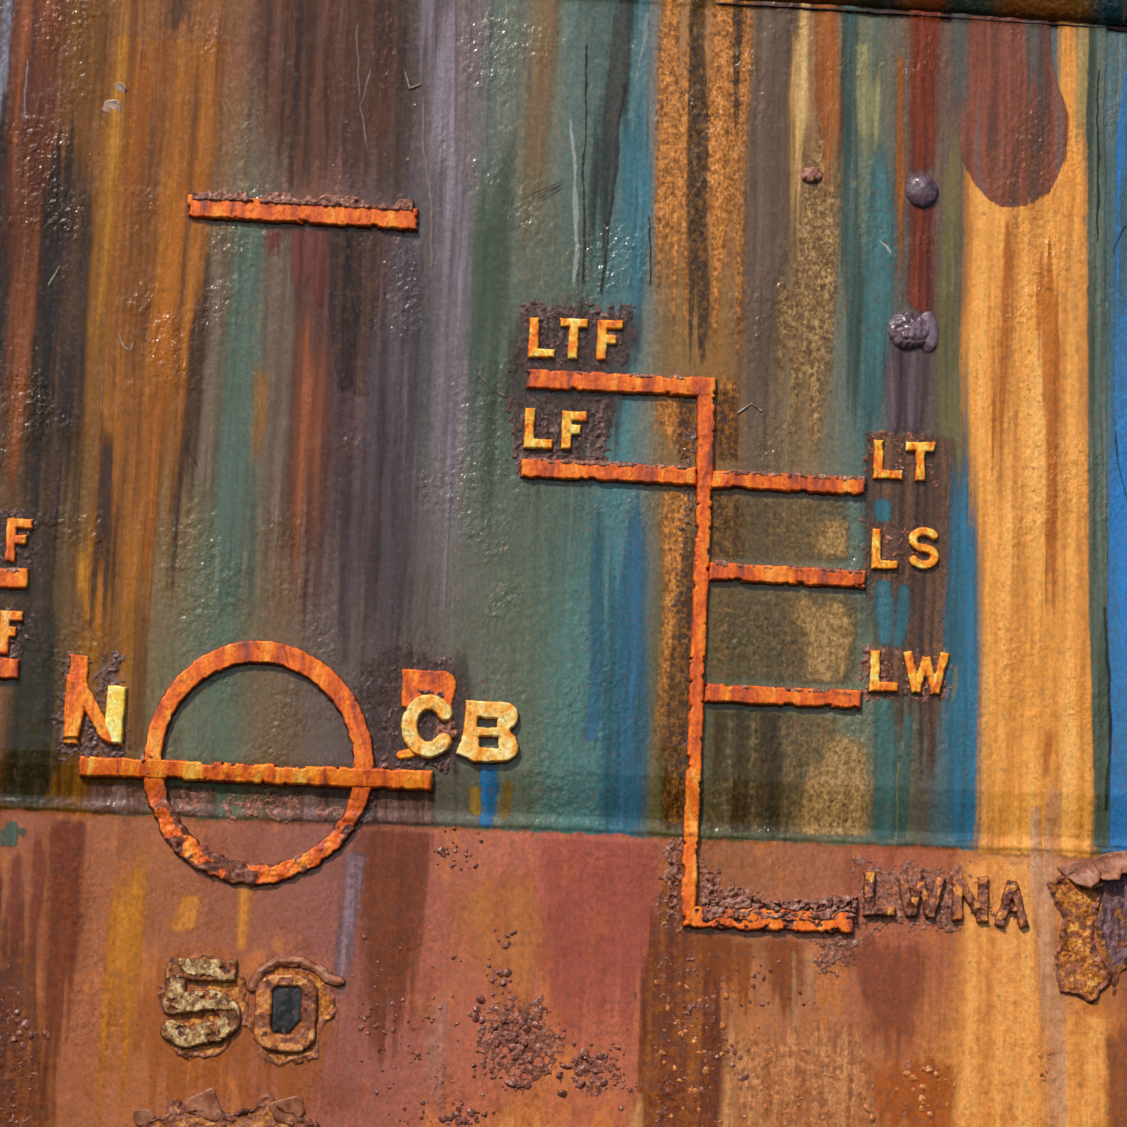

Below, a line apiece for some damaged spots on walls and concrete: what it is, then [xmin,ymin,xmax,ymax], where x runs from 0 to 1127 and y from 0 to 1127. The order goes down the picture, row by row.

leakage [953,13,967,97]
corrosion [52,0,414,814]
corrosion [454,0,1127,1127]
corrosion [169,786,344,824]
corrosion [172,895,199,931]
corrosion [237,884,252,950]
peeling [1057,851,1127,889]
corrosion [0,904,53,1127]
corrosion [99,864,144,1089]
corrosion [171,955,339,1068]
corrosion [352,947,496,1127]
corrosion [133,1087,320,1127]